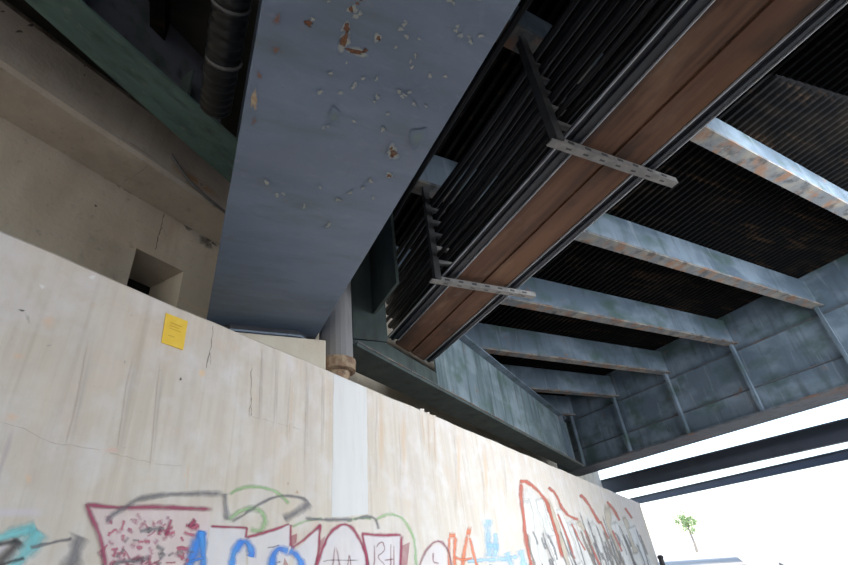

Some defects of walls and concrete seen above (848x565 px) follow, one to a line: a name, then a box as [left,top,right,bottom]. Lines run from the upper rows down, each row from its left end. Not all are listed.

corrosion [336,0,383,59]